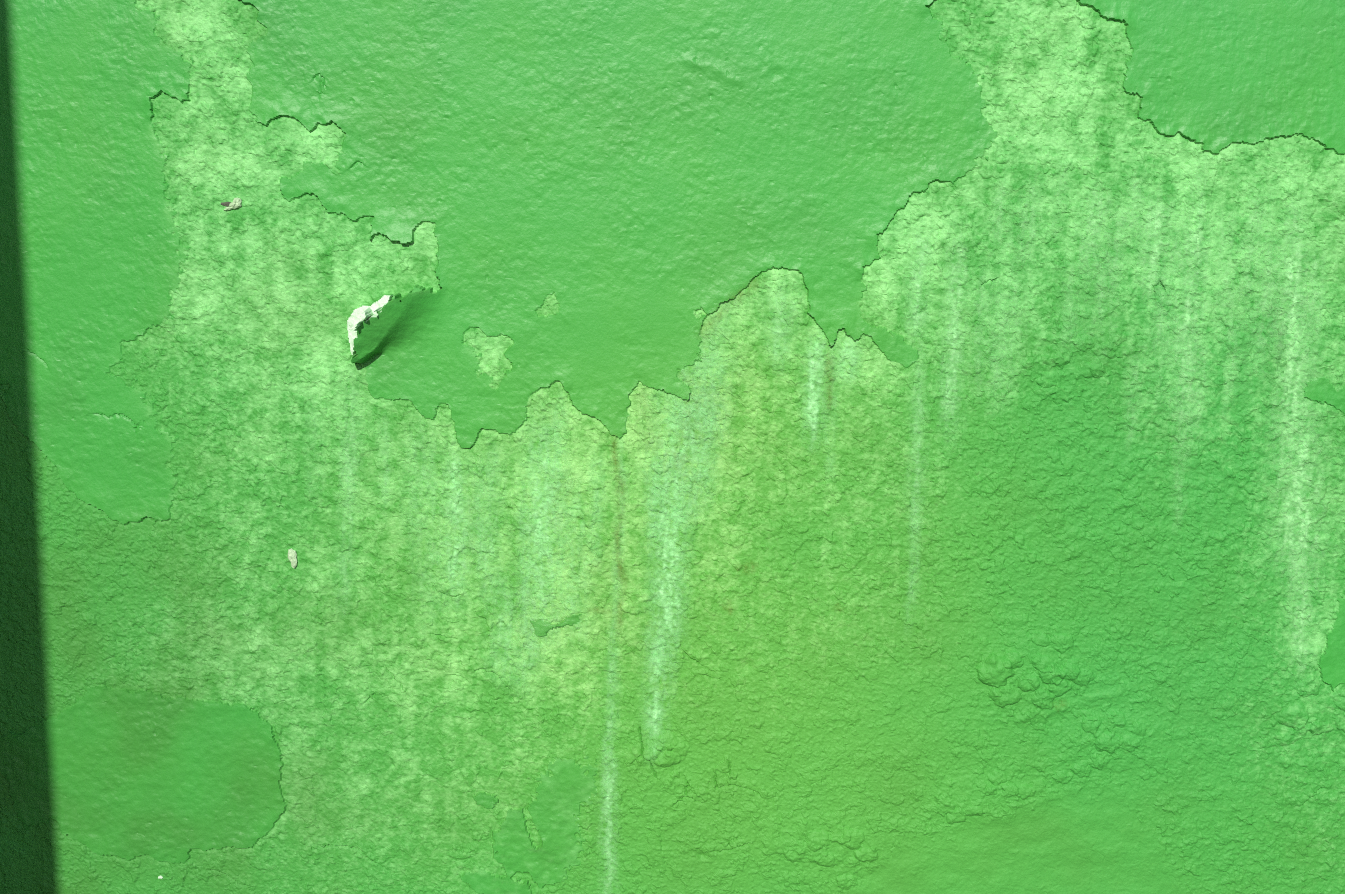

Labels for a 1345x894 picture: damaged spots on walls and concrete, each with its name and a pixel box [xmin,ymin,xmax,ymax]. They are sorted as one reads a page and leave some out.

leakage [1145,204,1165,278]
peeling [107,0,1345,716]
leakage [806,342,824,430]
leakage [946,249,964,409]
leakage [1182,277,1198,399]
leakage [1278,221,1319,651]
leakage [648,405,706,734]
leakage [604,775,614,884]